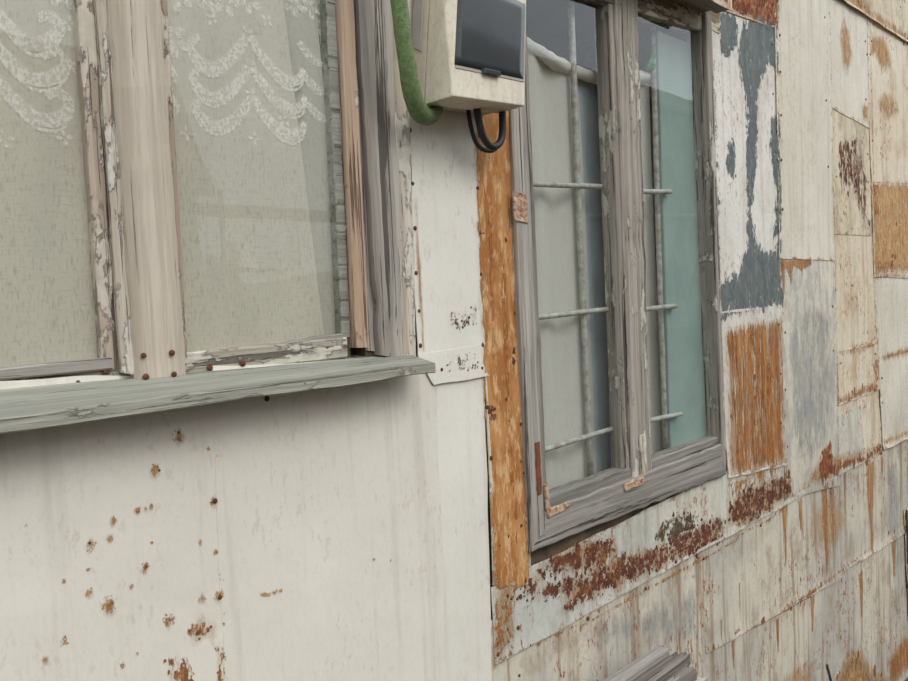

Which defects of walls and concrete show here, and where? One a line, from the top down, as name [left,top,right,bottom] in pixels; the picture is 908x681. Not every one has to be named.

corrosion [724,0,779,28]
peeling [713,11,784,321]
corrosion [836,137,908,279]
corrosion [727,313,786,474]
corrosion [615,505,787,607]
corrosion [776,435,883,648]
corrosion [163,658,194,681]
corrosion [188,622,225,640]
corrosion [836,638,908,681]